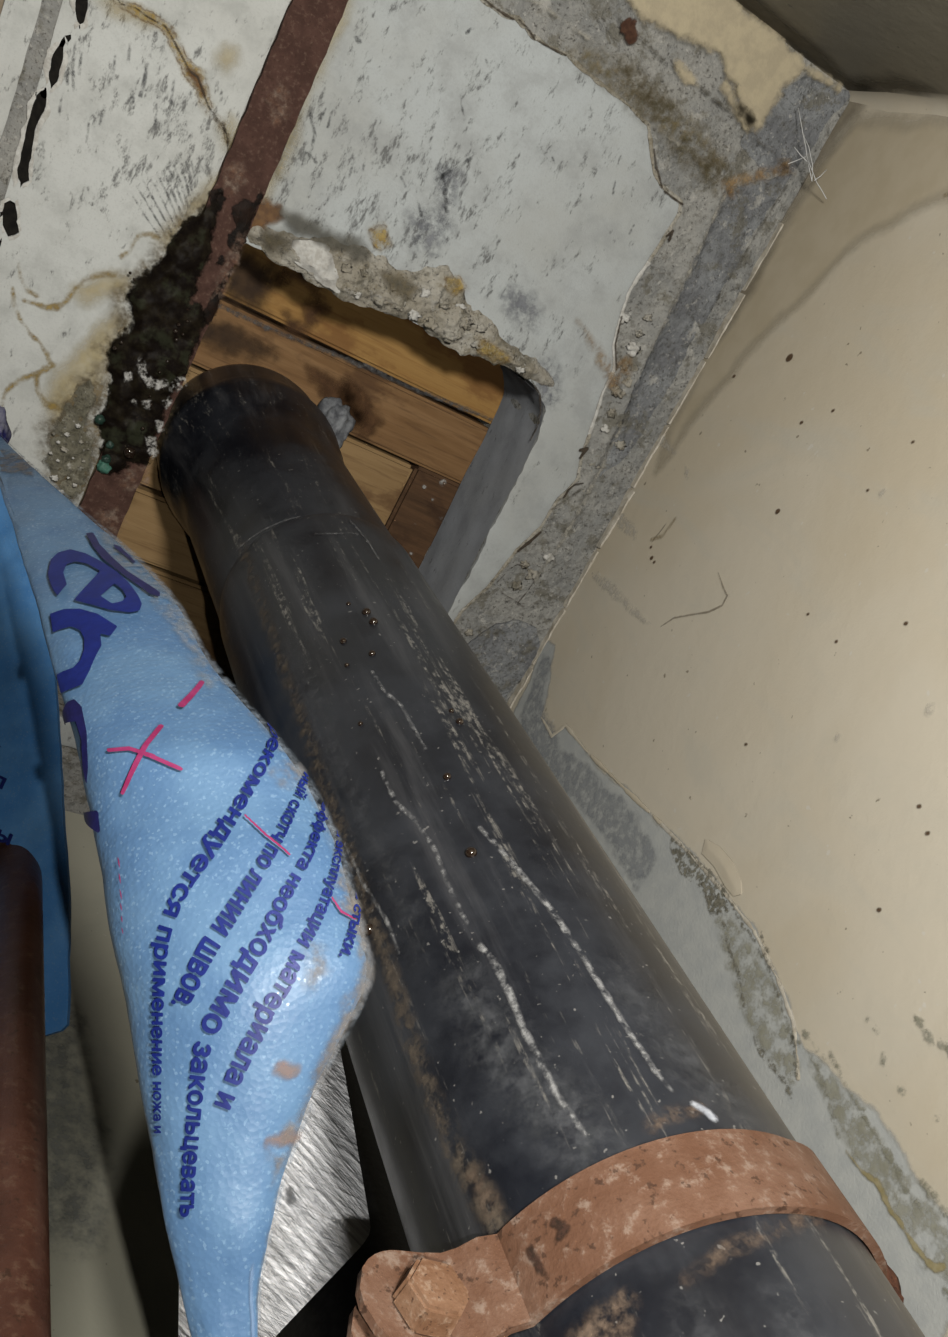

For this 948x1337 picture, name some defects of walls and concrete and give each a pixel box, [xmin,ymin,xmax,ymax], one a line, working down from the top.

corrosion [115,3,210,100]
water stain [6,126,328,500]
corrosion [251,199,388,260]
corrosion [385,274,416,297]
flaking render [247,225,555,387]
water stain [660,0,948,466]
water stain [307,367,380,435]
flaking render [454,0,948,1337]